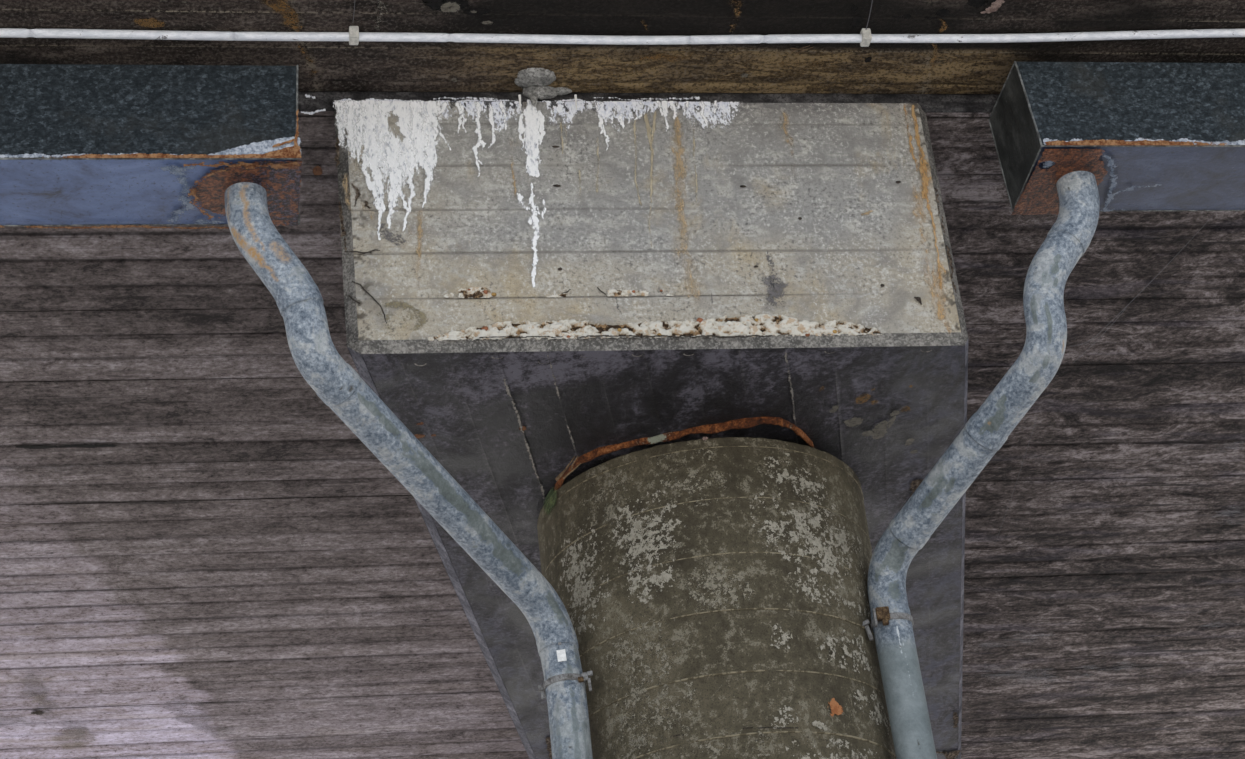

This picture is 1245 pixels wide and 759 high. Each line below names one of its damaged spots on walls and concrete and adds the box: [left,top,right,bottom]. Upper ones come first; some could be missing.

corrosion [0,110,323,229]
damp [301,94,740,287]
corrosion [1012,138,1245,215]
peeling [749,453,870,617]
peeling [560,437,798,759]
peeling [817,629,890,731]
peeling [786,738,880,759]